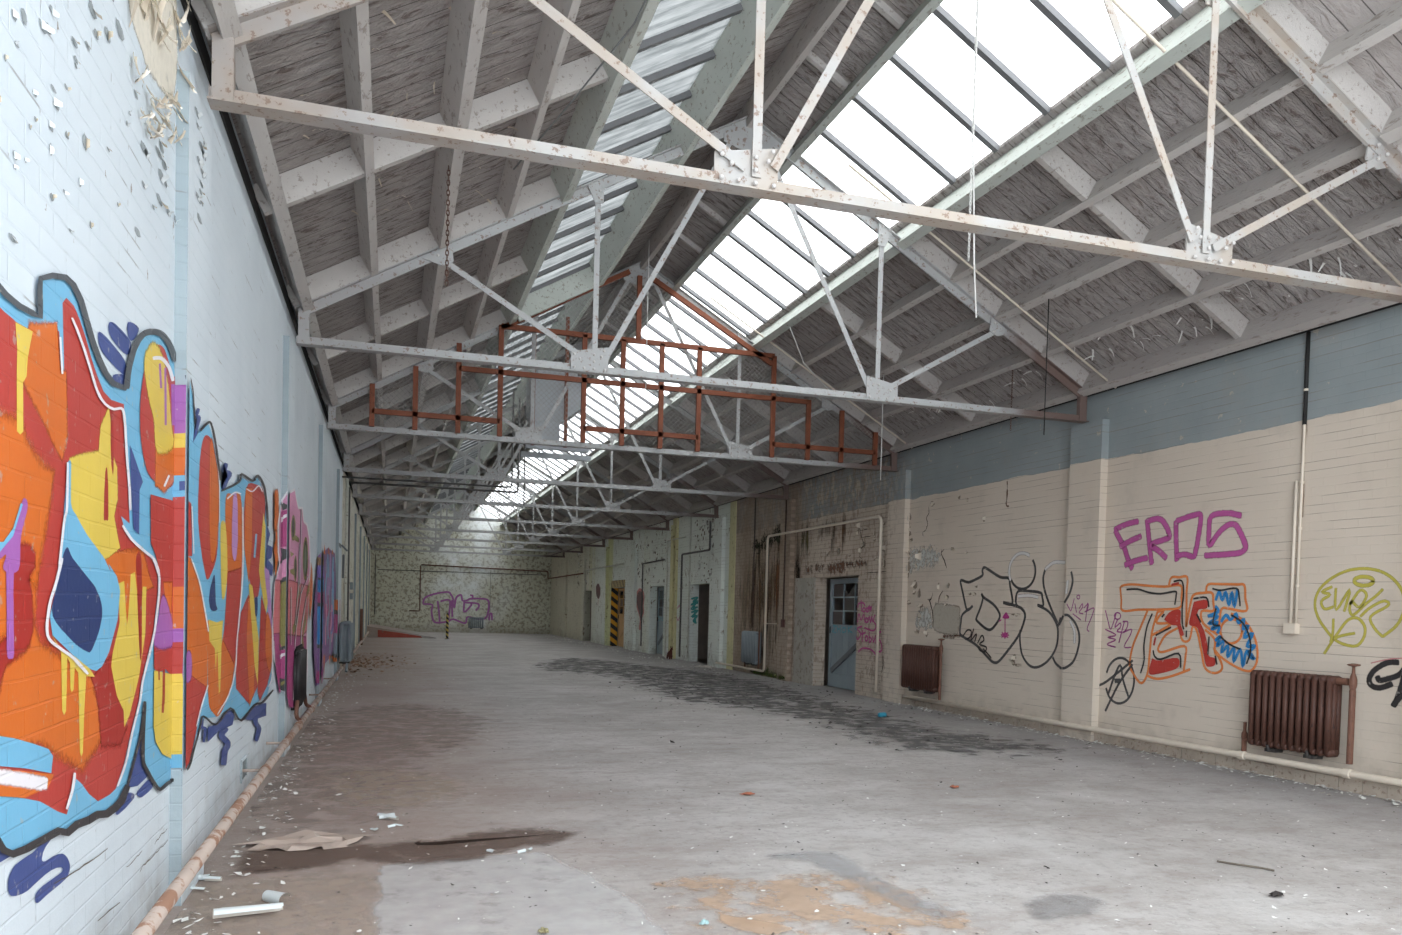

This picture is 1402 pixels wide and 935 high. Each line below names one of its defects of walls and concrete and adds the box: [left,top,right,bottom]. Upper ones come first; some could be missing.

peeling [11,5,59,34]
peeling [29,84,90,155]
peeling [72,0,208,224]
damp [237,828,572,873]